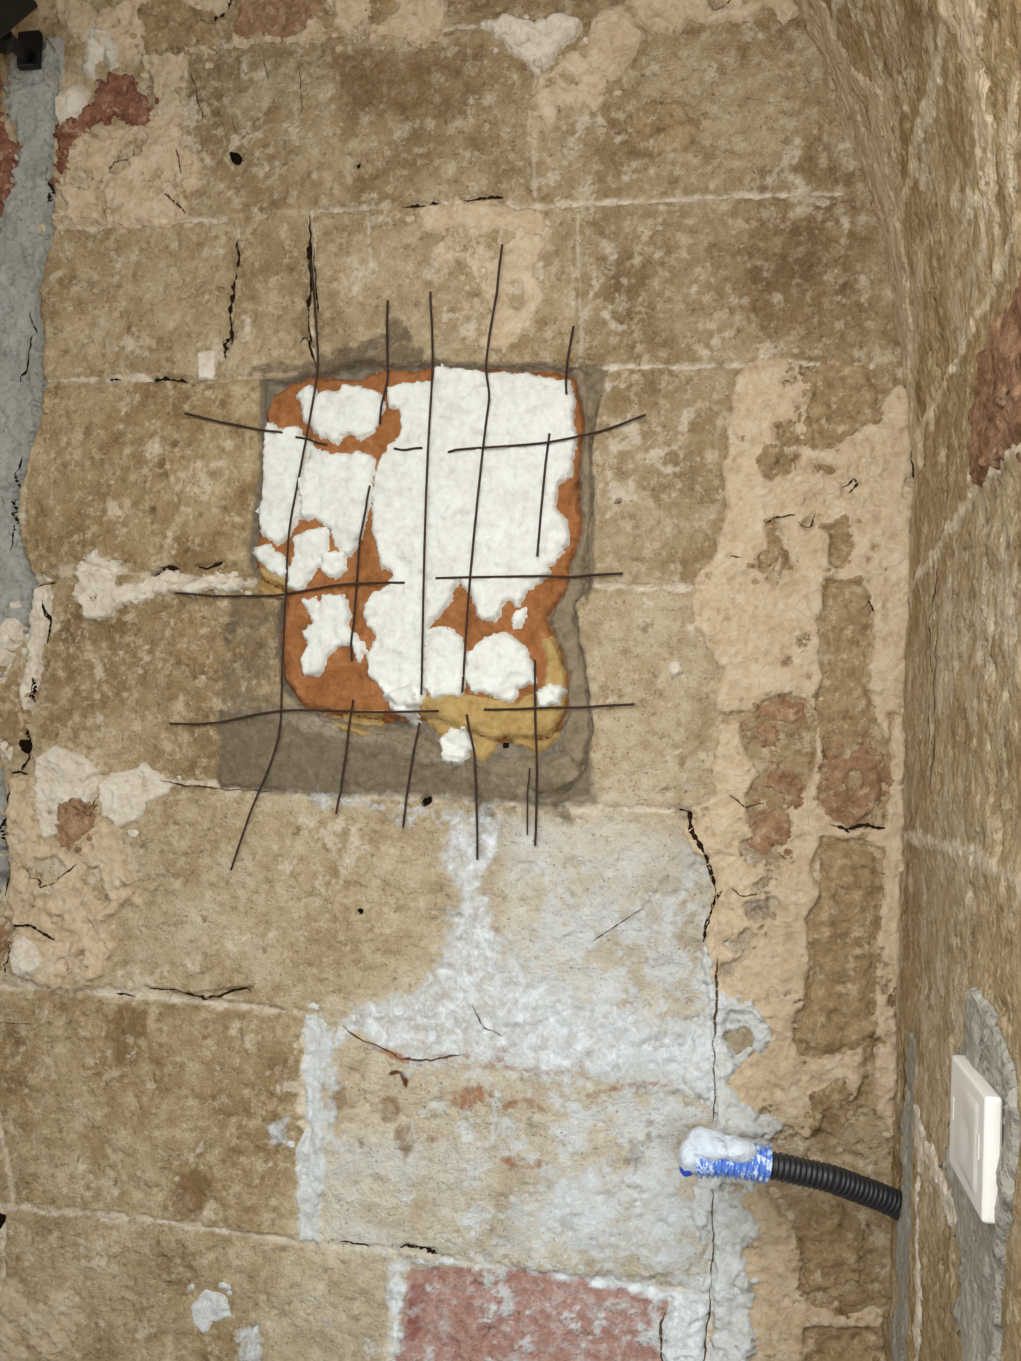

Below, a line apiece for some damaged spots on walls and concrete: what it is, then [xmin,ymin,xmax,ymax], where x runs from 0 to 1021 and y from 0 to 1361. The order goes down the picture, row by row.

peeling [38,0,449,234]
crack [222,238,240,359]
crack [300,215,319,368]
peeling [69,548,252,689]
peeling [623,0,914,1148]
peeling [0,745,181,992]
water stain [218,671,730,1097]
crack [679,809,757,1119]
water stain [269,1119,288,1144]
water stain [387,1257,457,1355]
water stain [528,1161,707,1361]
crack [703,1189,715,1361]